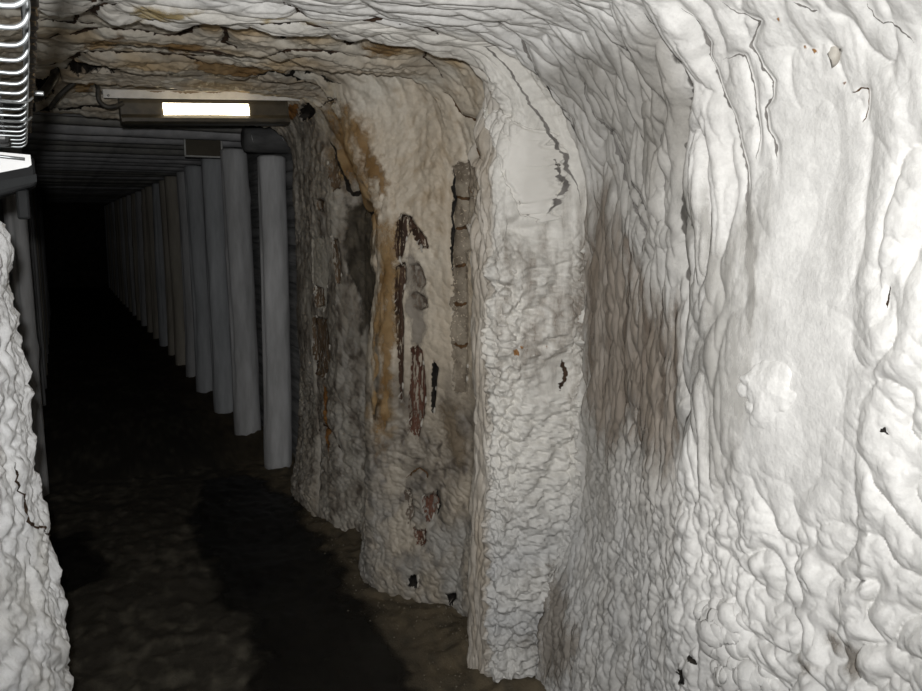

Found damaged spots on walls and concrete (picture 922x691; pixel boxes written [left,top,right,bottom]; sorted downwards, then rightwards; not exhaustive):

damp [343,204,376,334]
spalling [393,214,436,440]
spalling [449,160,480,393]
crack [549,159,569,212]
damp [554,186,680,474]
damp [690,197,755,476]
crack [14,463,50,536]